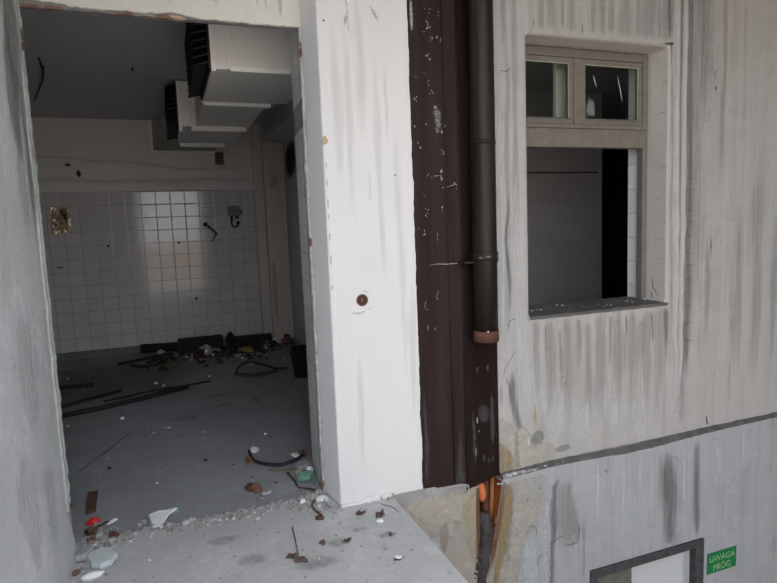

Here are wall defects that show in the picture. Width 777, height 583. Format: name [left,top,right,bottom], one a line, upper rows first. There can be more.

water stain [679,43,692,353]
water stain [476,381,550,473]